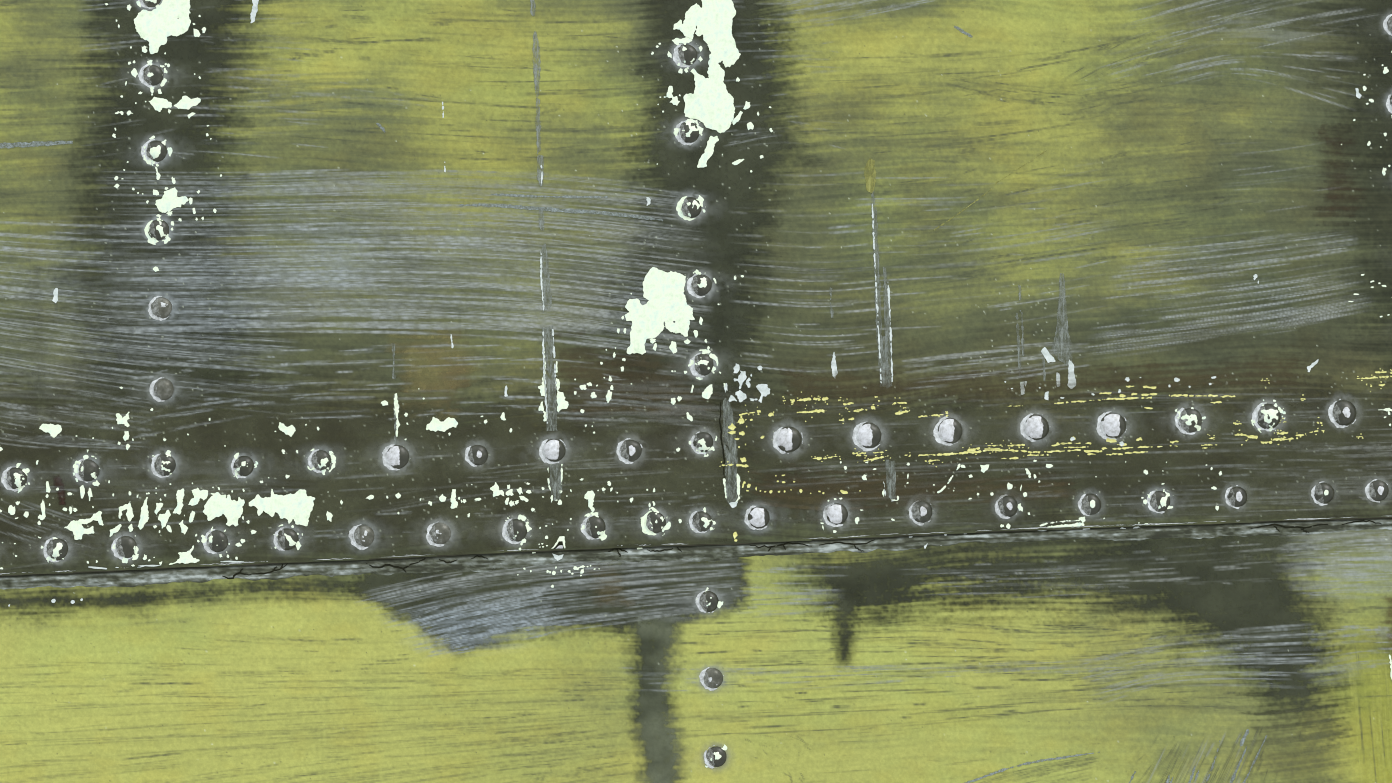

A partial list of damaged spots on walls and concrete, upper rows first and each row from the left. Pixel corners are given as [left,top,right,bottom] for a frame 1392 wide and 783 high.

peeling [105,0,206,138]
peeling [651,0,773,188]
peeling [112,412,134,450]
peeling [0,422,343,569]
peeling [538,267,1179,531]
peeling [1039,376,1235,511]